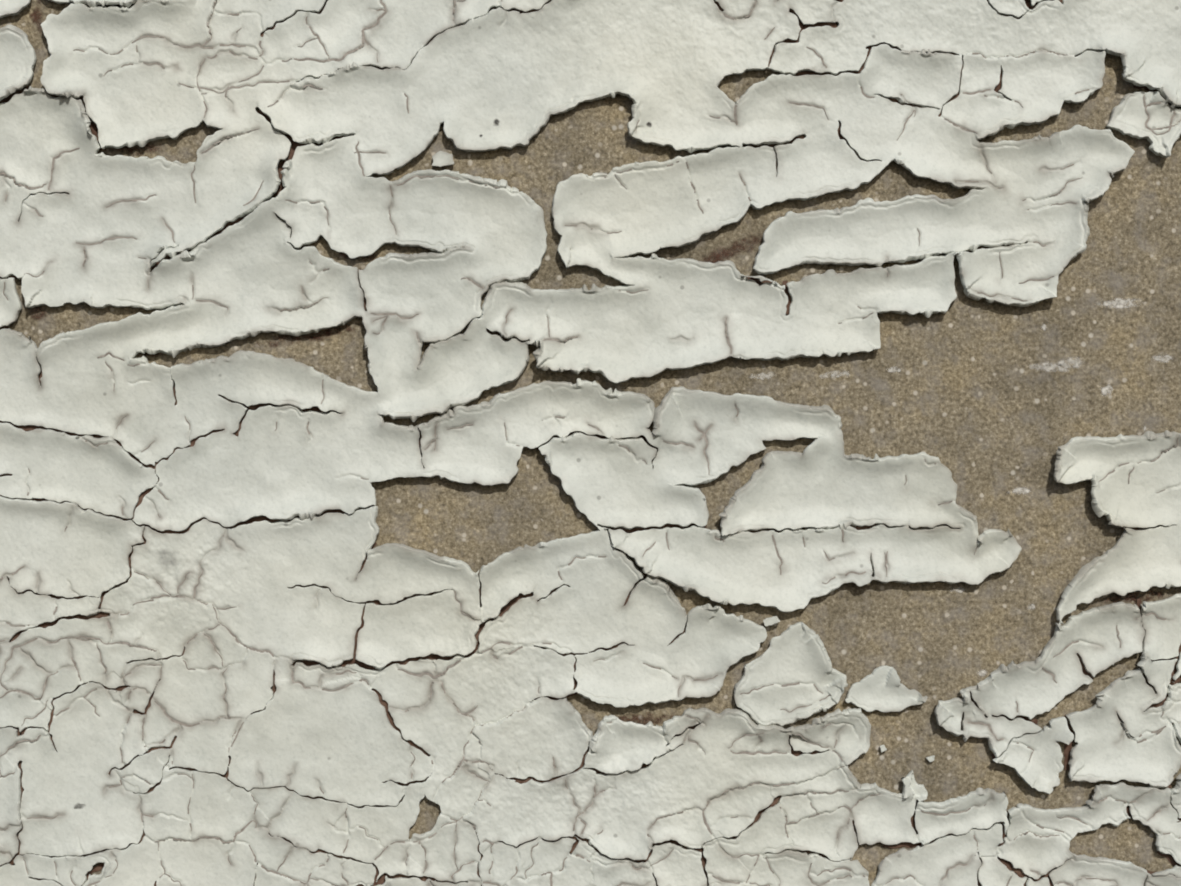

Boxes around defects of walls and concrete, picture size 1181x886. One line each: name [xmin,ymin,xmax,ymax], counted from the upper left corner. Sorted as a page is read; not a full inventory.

peeling [0,0,260,203]
peeling [206,181,264,241]
peeling [0,271,167,348]
peeling [97,317,378,442]
peeling [265,0,1181,886]
crack [0,395,729,886]
crack [731,737,787,755]